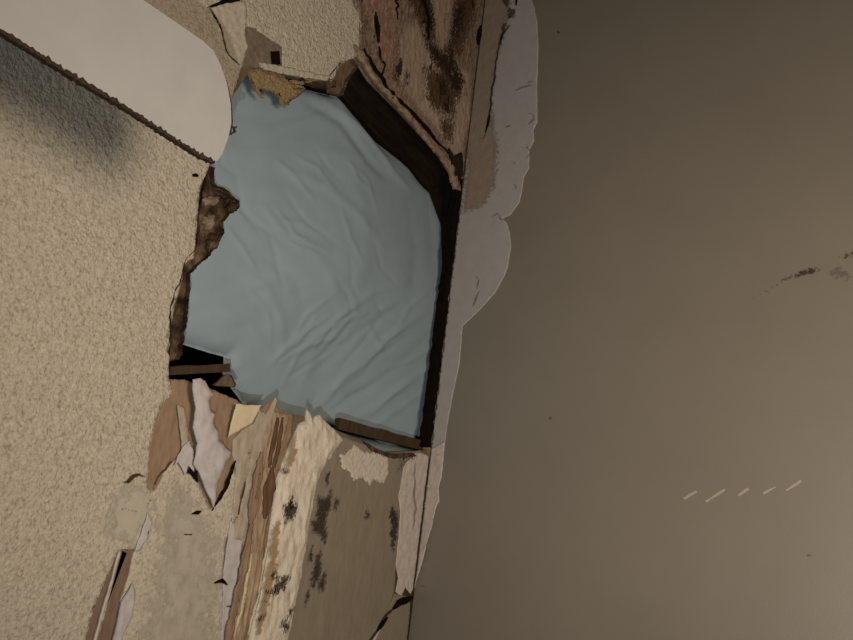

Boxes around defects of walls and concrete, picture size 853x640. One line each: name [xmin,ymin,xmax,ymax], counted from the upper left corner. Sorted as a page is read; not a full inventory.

water stain [378,0,476,156]
spalling [168,166,240,361]
spalling [212,374,236,387]
flaking render [288,0,539,640]
water stain [282,435,297,474]
water stain [257,495,298,635]
mould [305,472,340,607]
crack [370,594,414,640]
water stain [389,506,399,550]